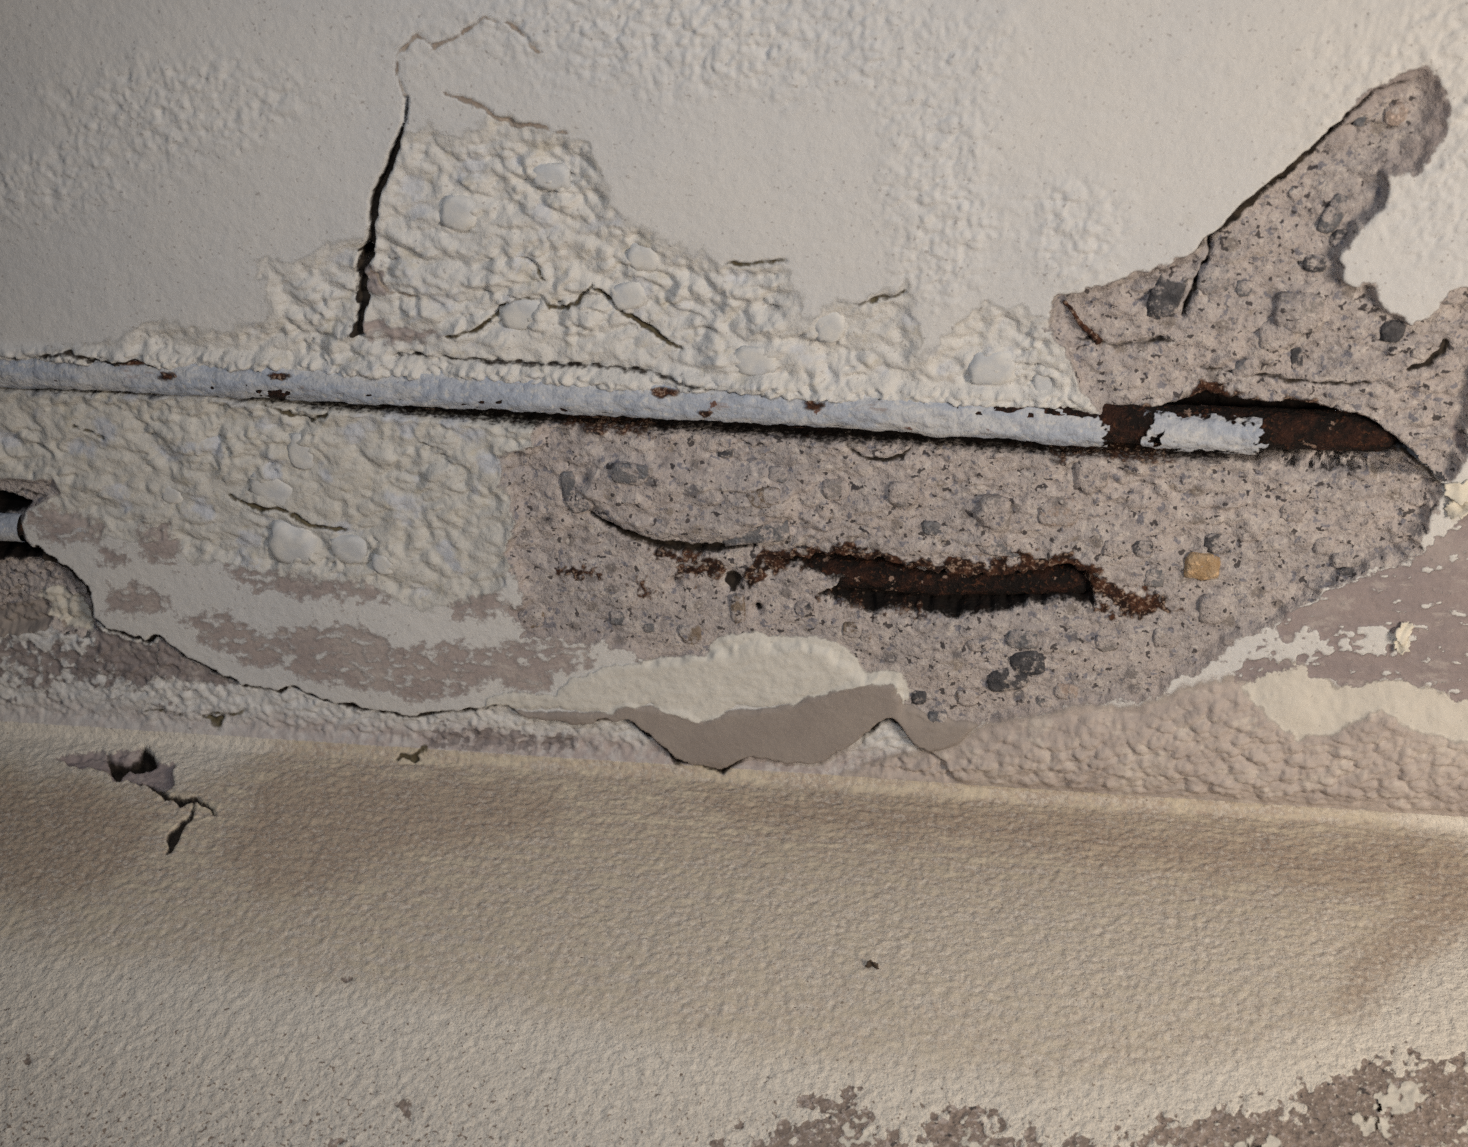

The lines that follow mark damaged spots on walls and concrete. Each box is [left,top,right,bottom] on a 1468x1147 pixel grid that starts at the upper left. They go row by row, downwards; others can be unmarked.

crack [349,16,763,397]
spalling [0,65,1468,729]
crack [229,494,347,531]
rust [554,565,602,582]
rust [626,576,664,599]
rust [645,542,727,589]
crack [36,545,515,763]
peeling [428,721,575,755]
crack [140,784,215,855]
water stain [0,741,1468,965]
peeling [709,1085,1044,1147]
peeling [1062,1041,1468,1147]